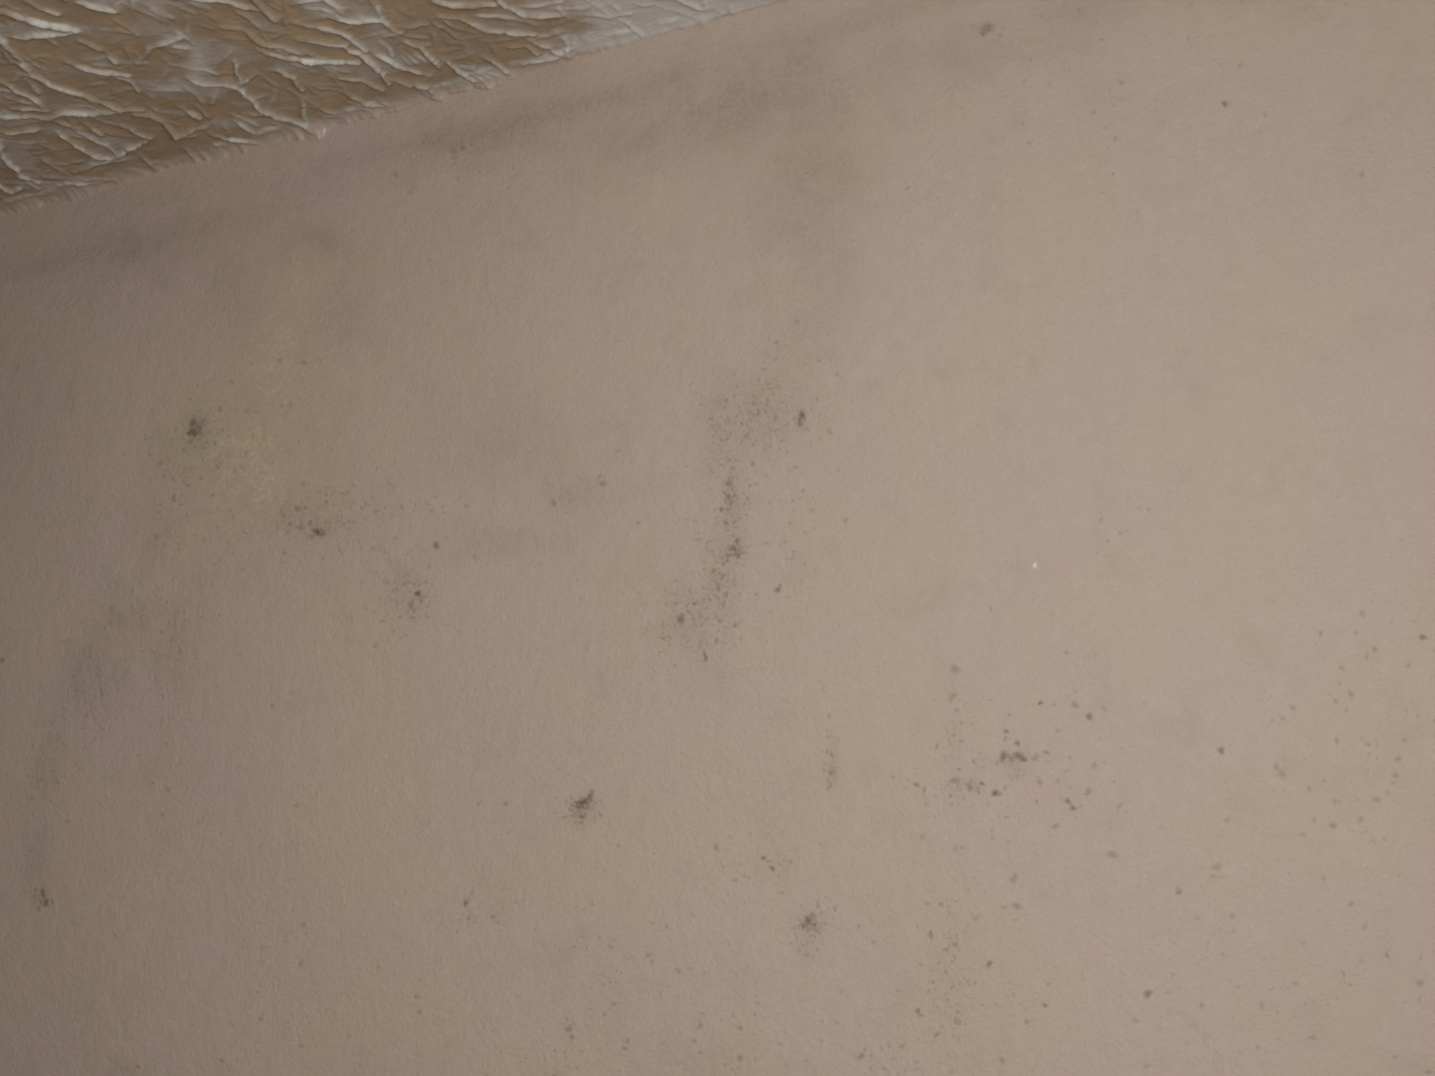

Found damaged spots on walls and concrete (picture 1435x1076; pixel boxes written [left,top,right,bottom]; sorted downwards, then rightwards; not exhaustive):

water stain [0,0,586,203]